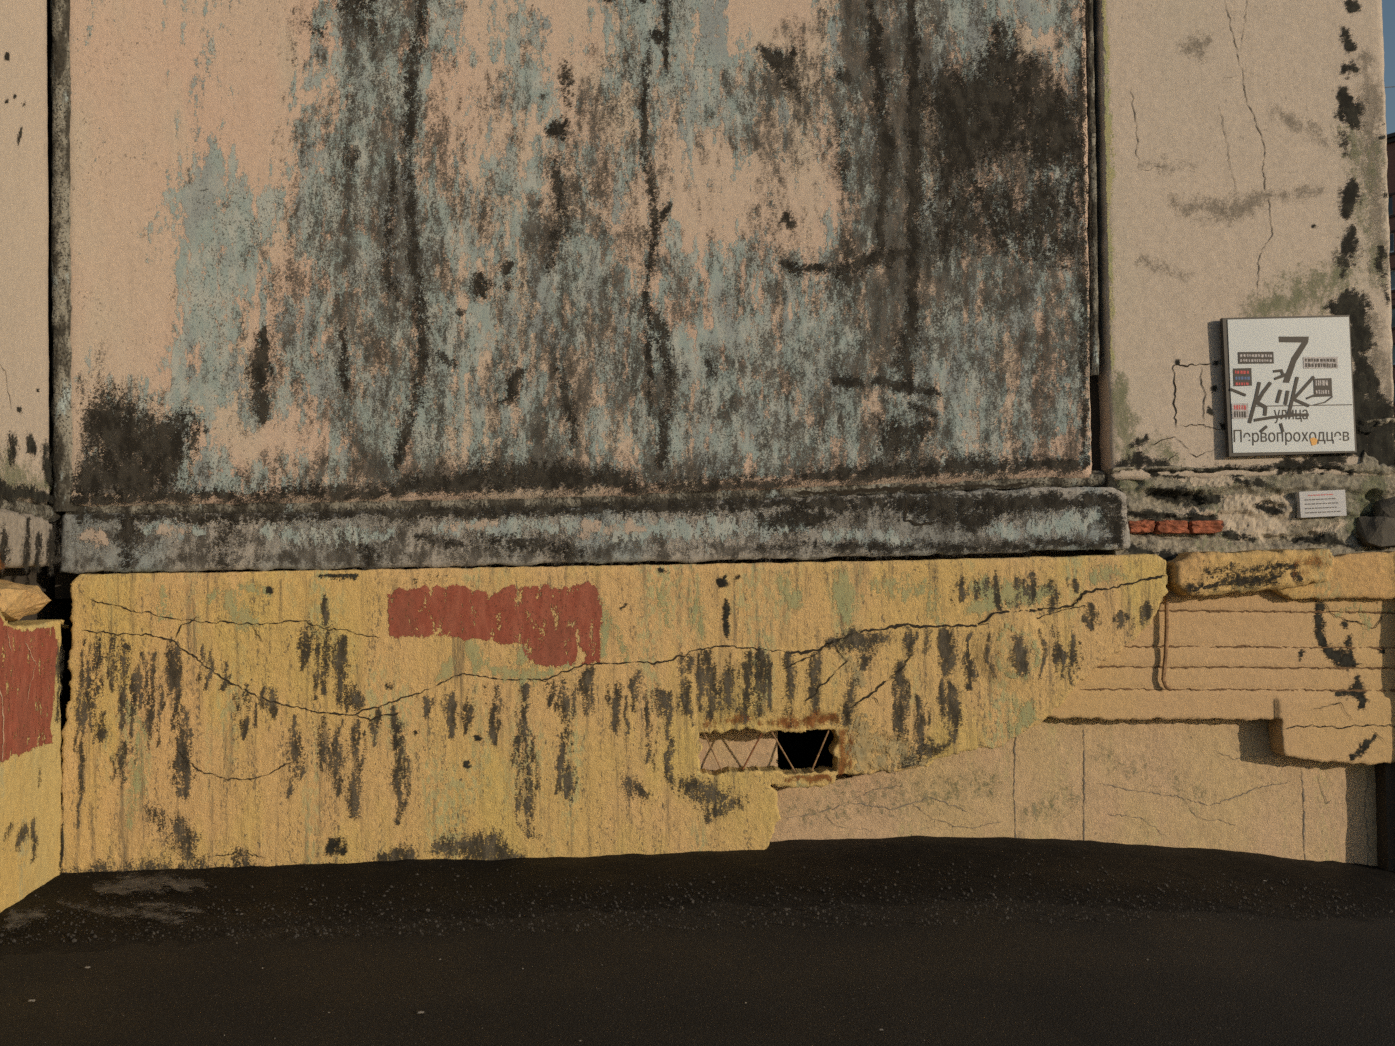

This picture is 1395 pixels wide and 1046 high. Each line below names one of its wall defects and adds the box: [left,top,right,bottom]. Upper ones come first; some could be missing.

peeling [74,0,1092,497]
peeling [1102,0,1118,372]
crack [1219,0,1274,299]
leakage [0,0,1395,690]
peeling [983,470,1356,545]
leakage [54,593,823,923]
crack [85,575,1168,721]
leakage [890,626,979,763]
peeling [1298,599,1392,711]
peeling [1349,733,1377,762]
leakage [4,817,39,865]